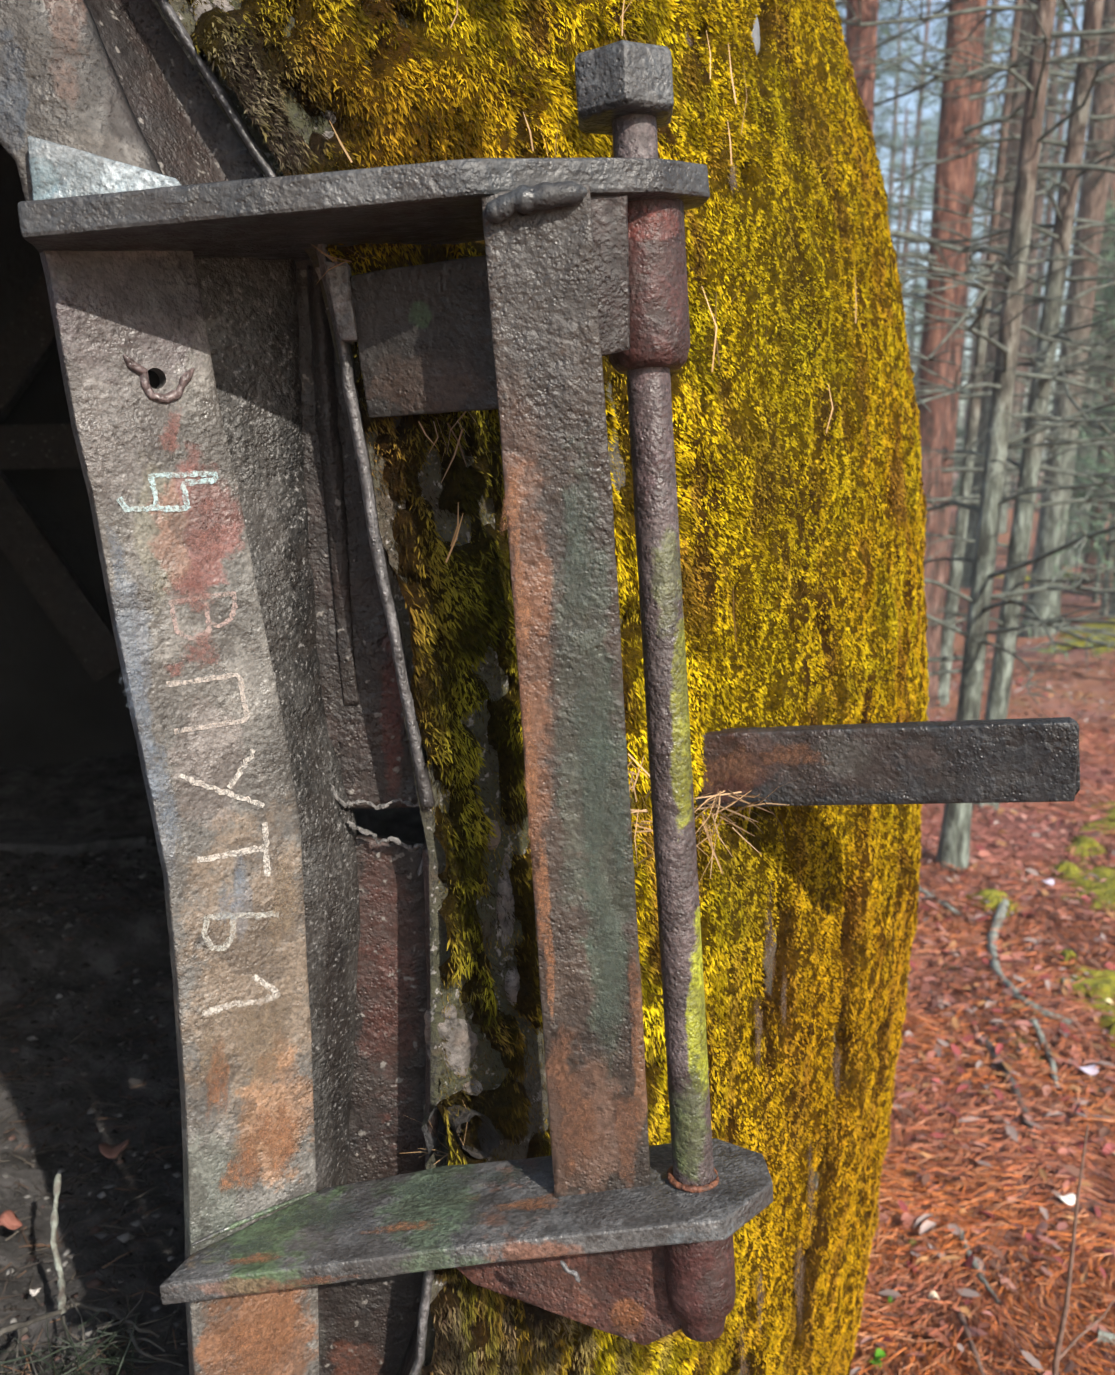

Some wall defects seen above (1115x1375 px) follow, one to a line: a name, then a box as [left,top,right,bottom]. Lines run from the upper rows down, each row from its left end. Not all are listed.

rust [504,468,530,652]
crack [330,784,423,876]
rust [701,744,819,790]
rust [523,702,639,1187]